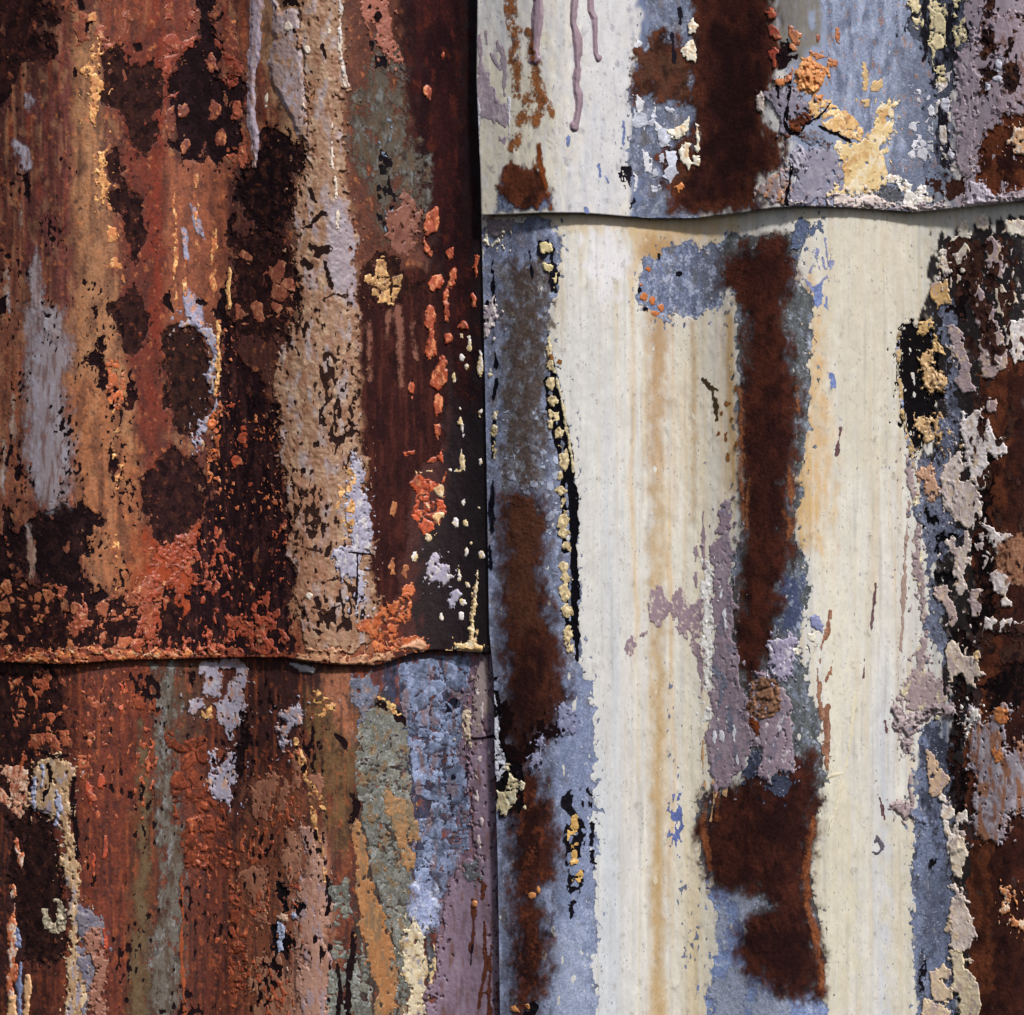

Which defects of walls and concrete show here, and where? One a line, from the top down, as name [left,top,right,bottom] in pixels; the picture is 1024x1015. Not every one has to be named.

corrosion [0,0,480,1015]
peeling [180,657,340,1015]
peeling [394,214,606,1015]
corrosion [495,0,555,213]
corrosion [495,257,574,1015]
corrosion [667,0,838,214]
corrosion [714,230,804,685]
corrosion [692,740,828,1003]
peeling [618,0,1024,1015]
corrosion [934,235,1024,1015]